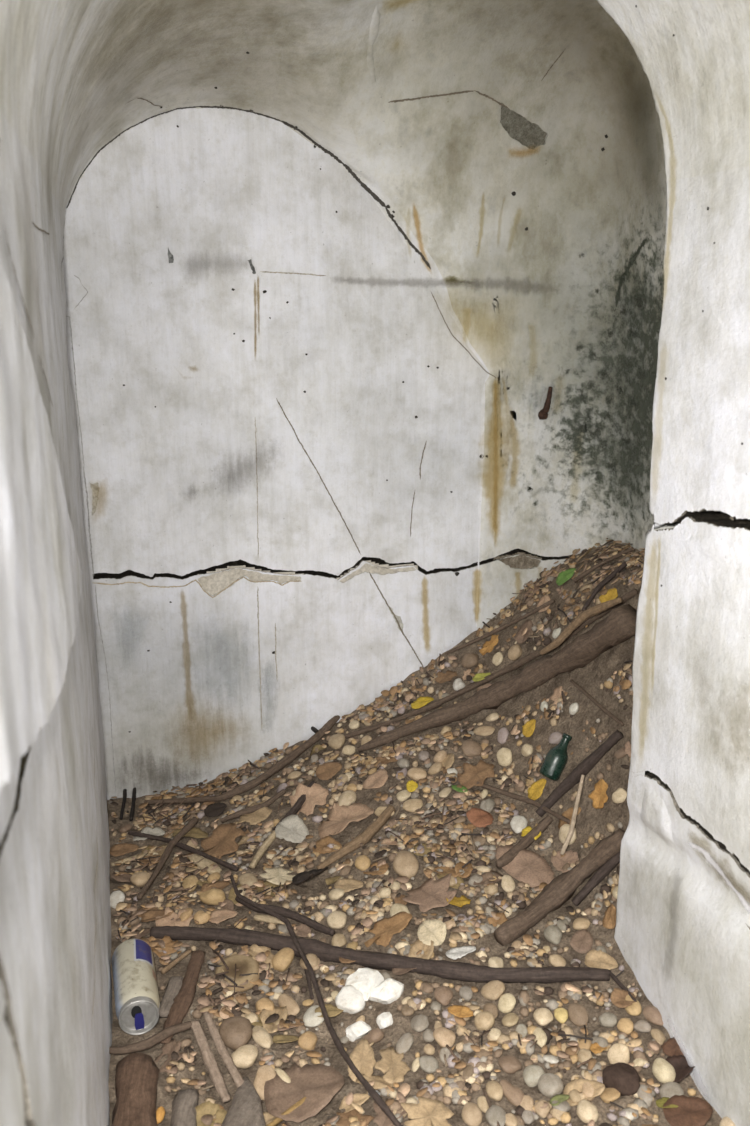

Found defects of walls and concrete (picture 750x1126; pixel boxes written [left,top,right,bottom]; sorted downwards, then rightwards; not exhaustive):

spalling [500,103,548,150]
crack [431,292,498,379]
damp [565,240,664,528]
crack [93,398,570,668]
crack [655,509,750,531]
crack [0,747,31,856]
crack [629,770,750,878]
crack [0,959,36,1126]